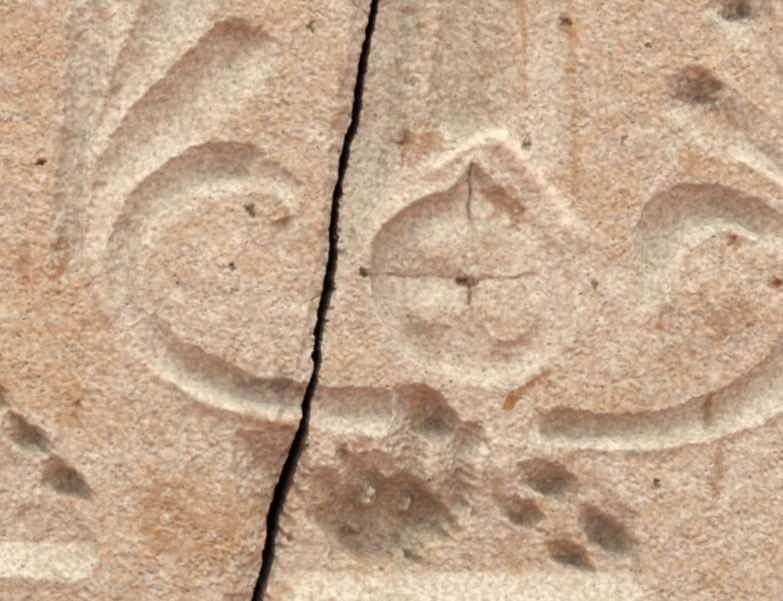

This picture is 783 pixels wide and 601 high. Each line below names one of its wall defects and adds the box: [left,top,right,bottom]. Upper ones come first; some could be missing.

crack [251,0,379,601]
spalling [225,425,296,601]
spalling [296,384,483,563]
spalling [495,460,566,522]
spalling [546,540,586,563]
spalling [578,503,620,547]